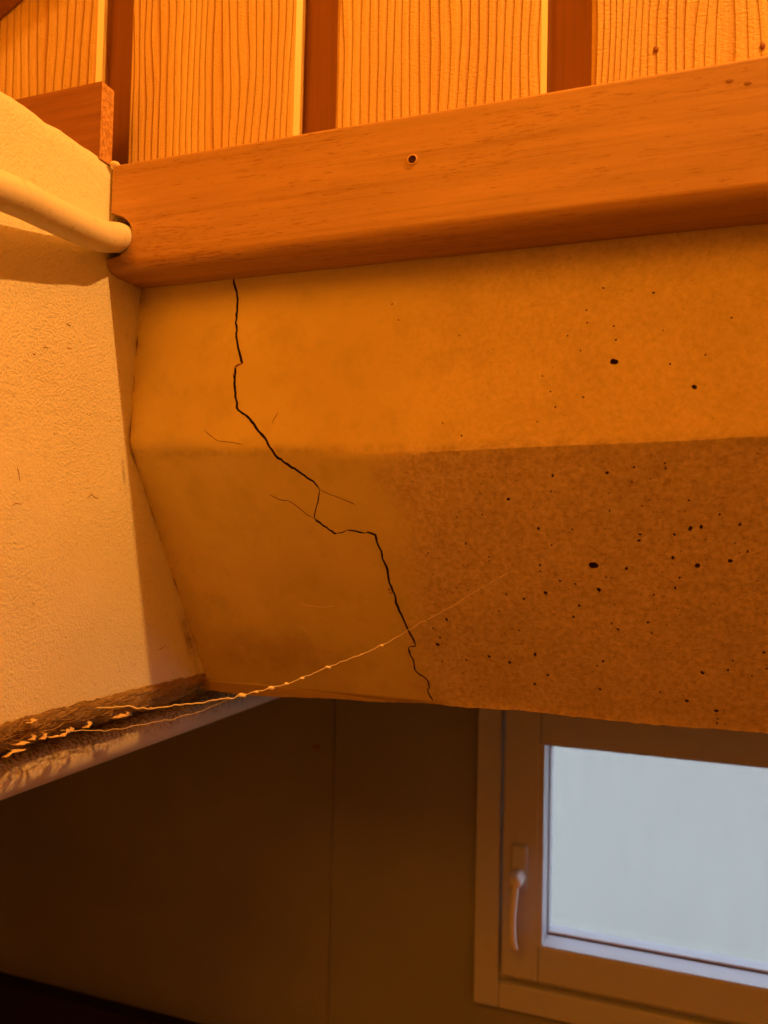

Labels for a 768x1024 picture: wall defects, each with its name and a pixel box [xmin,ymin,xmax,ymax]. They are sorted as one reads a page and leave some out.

crack [206,279,433,700]